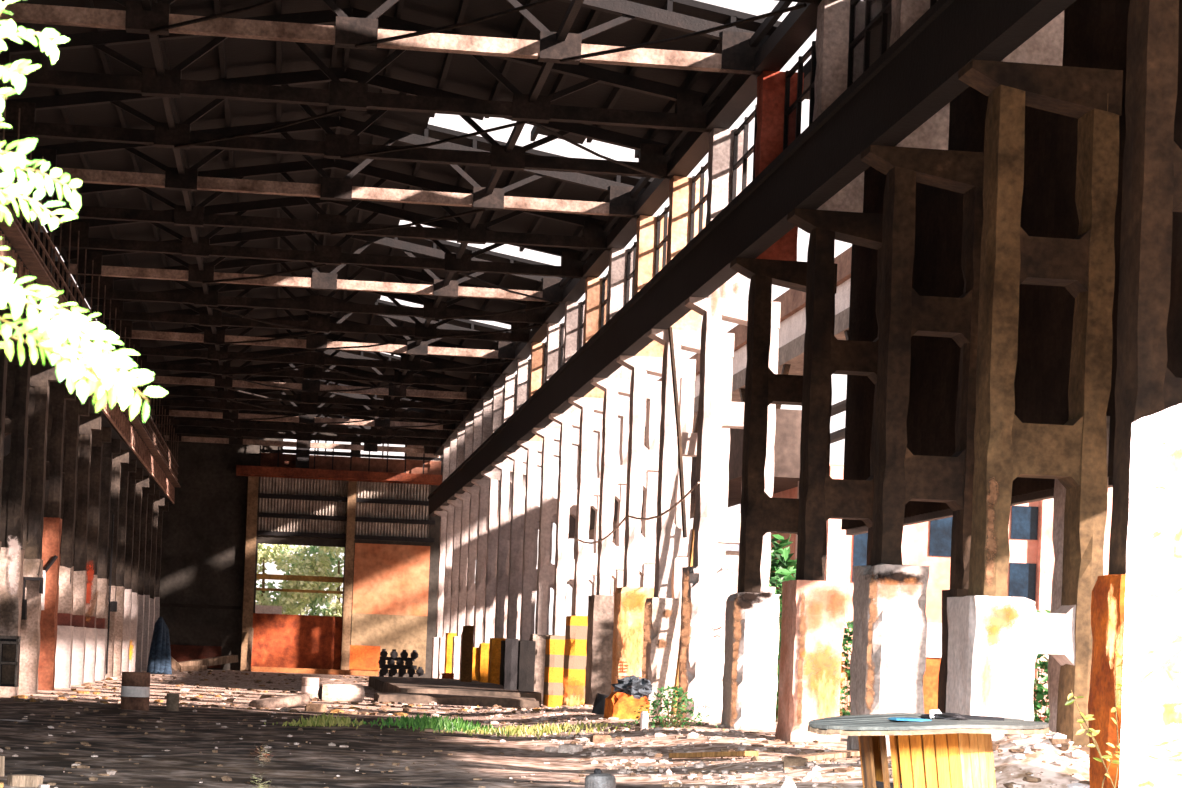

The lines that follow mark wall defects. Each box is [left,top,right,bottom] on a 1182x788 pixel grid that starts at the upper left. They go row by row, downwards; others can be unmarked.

corrosion [982,605,1019,709]
corrosion [1107,598,1123,701]
corrosion [1137,695,1182,788]